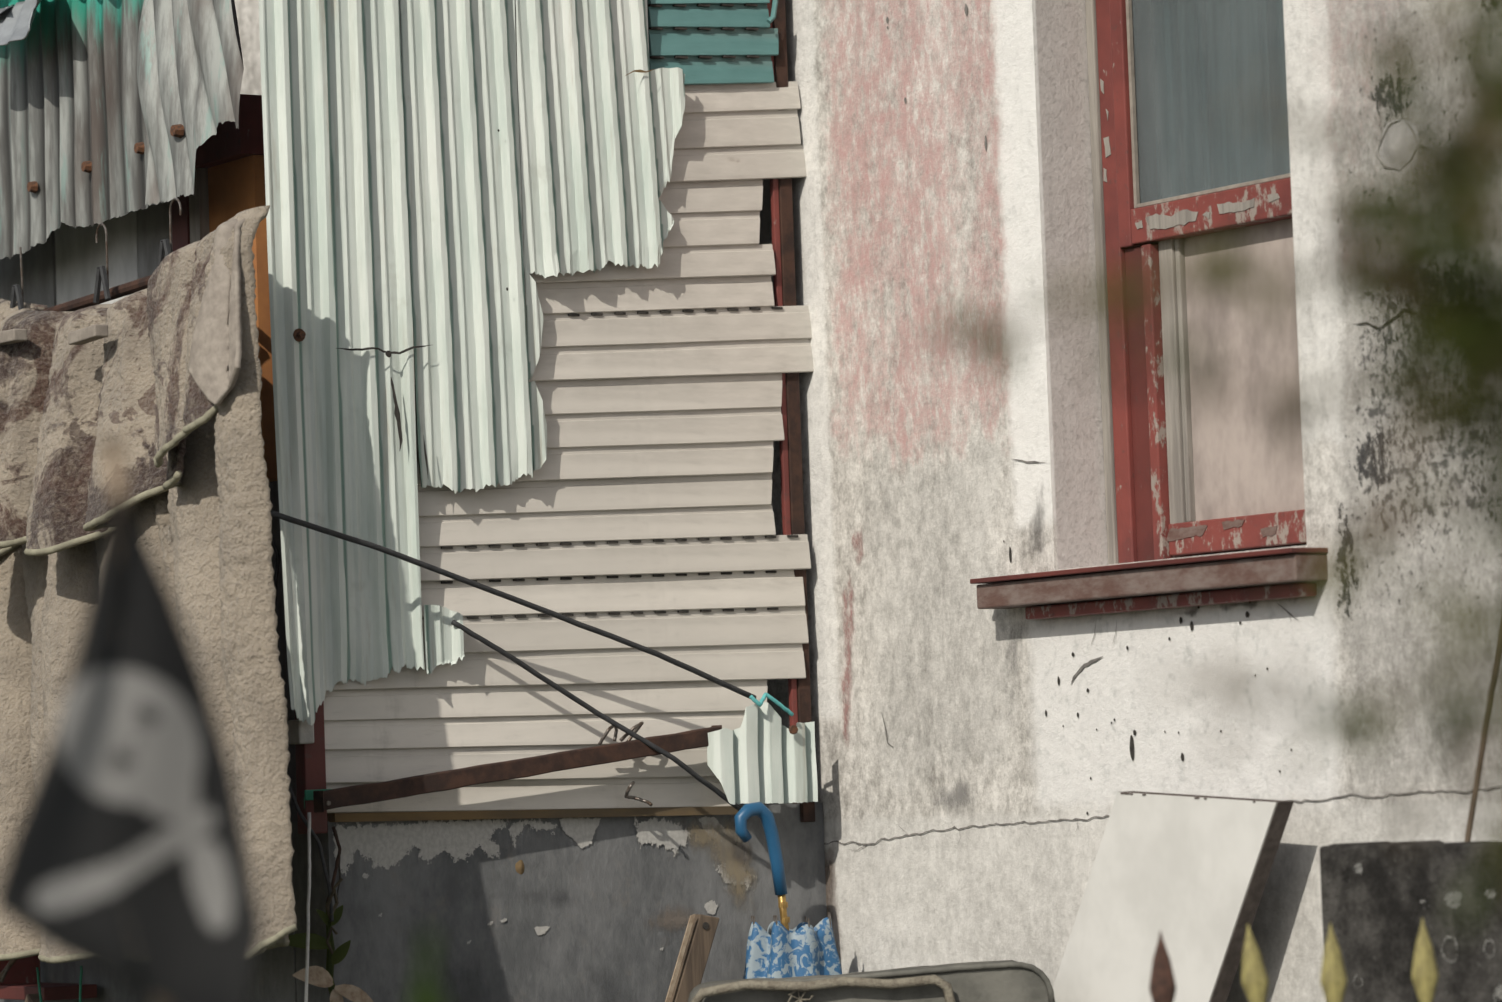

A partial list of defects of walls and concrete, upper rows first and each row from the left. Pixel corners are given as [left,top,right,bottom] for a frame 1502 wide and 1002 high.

damp [1359,82,1407,120]
peeling [1100,79,1111,182]
peeling [1135,193,1280,229]
crack [337,345,431,475]
peeling [1167,519,1278,542]
crack [1285,786,1502,803]
peeling [332,817,601,880]
peeling [634,816,725,857]
crack [824,815,1110,851]